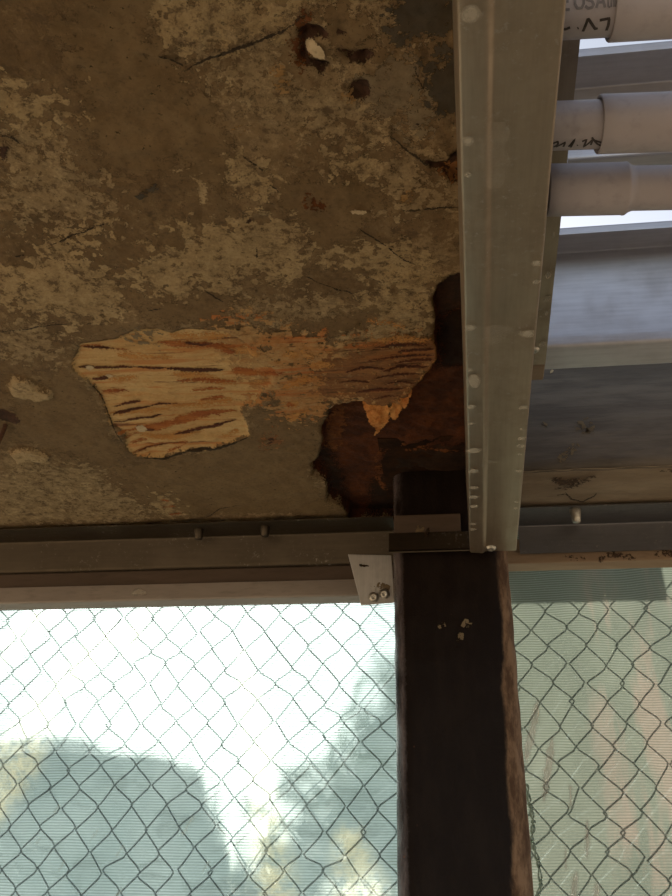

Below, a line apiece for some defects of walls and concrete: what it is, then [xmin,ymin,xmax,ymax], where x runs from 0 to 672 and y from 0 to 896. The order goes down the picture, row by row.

crack [159,14,309,71]
corrosion [285,8,347,76]
corrosion [336,47,374,66]
corrosion [337,79,371,104]
peeling [0,0,466,528]
corrosion [192,306,437,430]